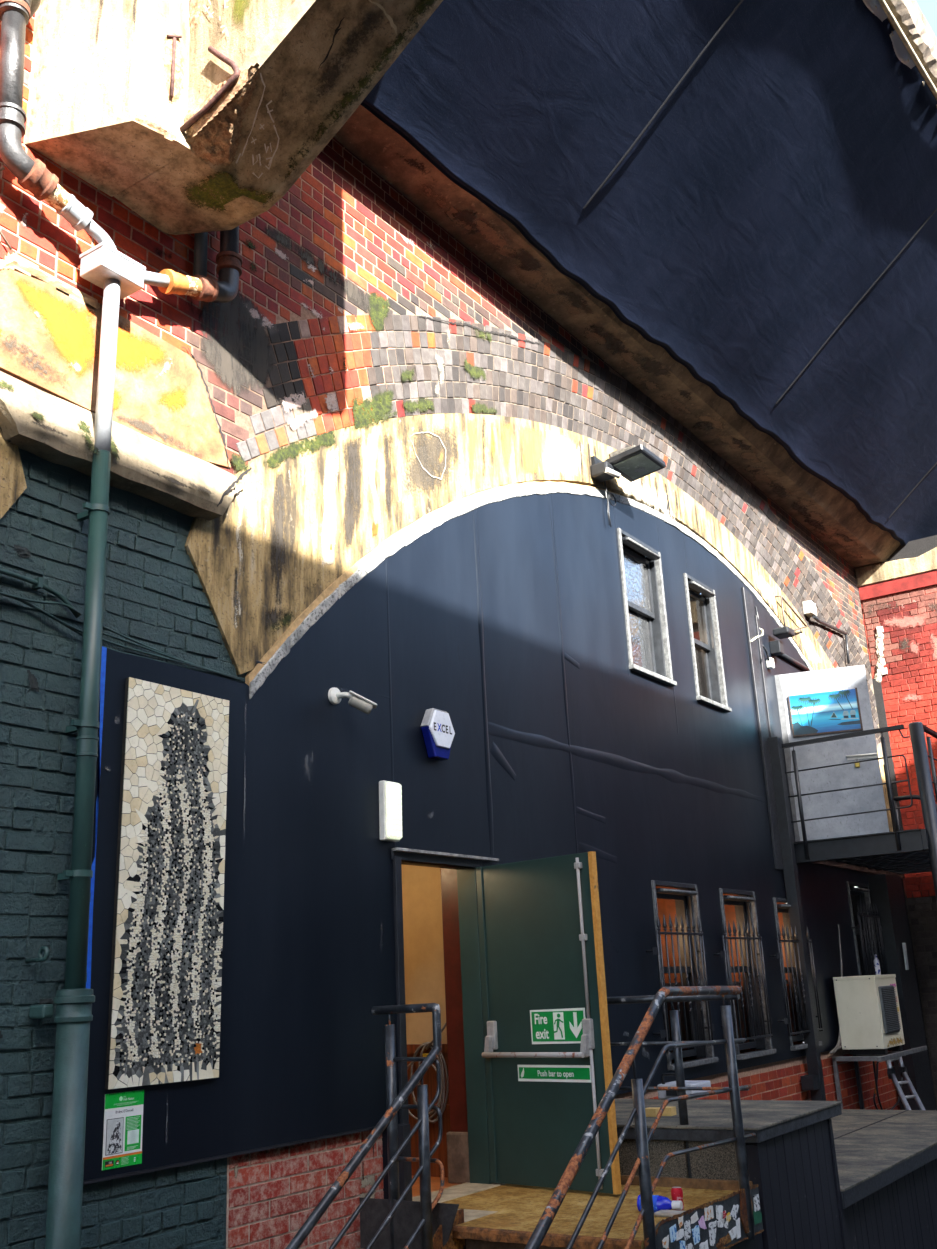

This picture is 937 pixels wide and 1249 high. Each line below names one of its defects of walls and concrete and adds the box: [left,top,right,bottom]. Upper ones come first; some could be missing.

damp [233,0,250,23]
damp [310,13,383,102]
rust [15,279,97,375]
rust [116,326,165,372]
rust [160,388,187,412]
damp [307,419,596,564]
damp [620,474,678,518]
damp [233,455,304,629]
damp [799,630,821,663]